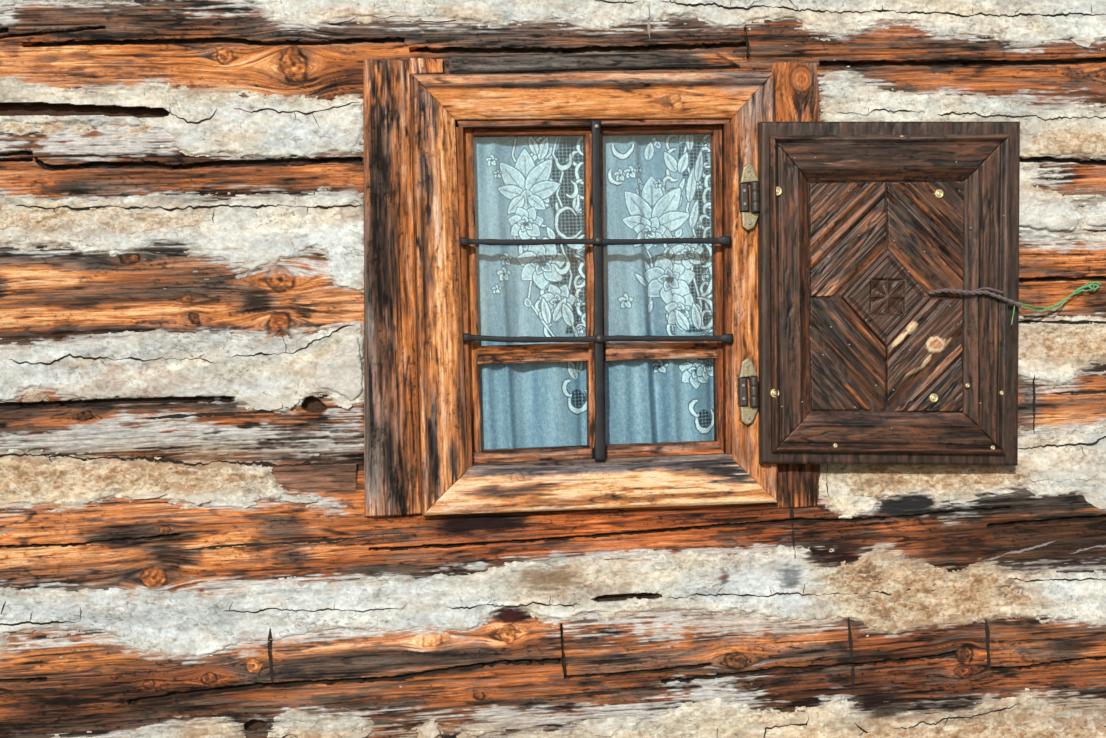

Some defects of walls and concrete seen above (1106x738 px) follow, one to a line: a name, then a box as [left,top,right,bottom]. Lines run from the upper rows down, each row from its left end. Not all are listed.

crack [595,0,1106,17]
crack [0,26,746,54]
crack [169,102,357,128]
crack [0,149,363,171]
peeling [238,392,352,412]
spalling [234,719,266,738]
peeling [420,721,440,738]
spalling [831,719,1106,738]